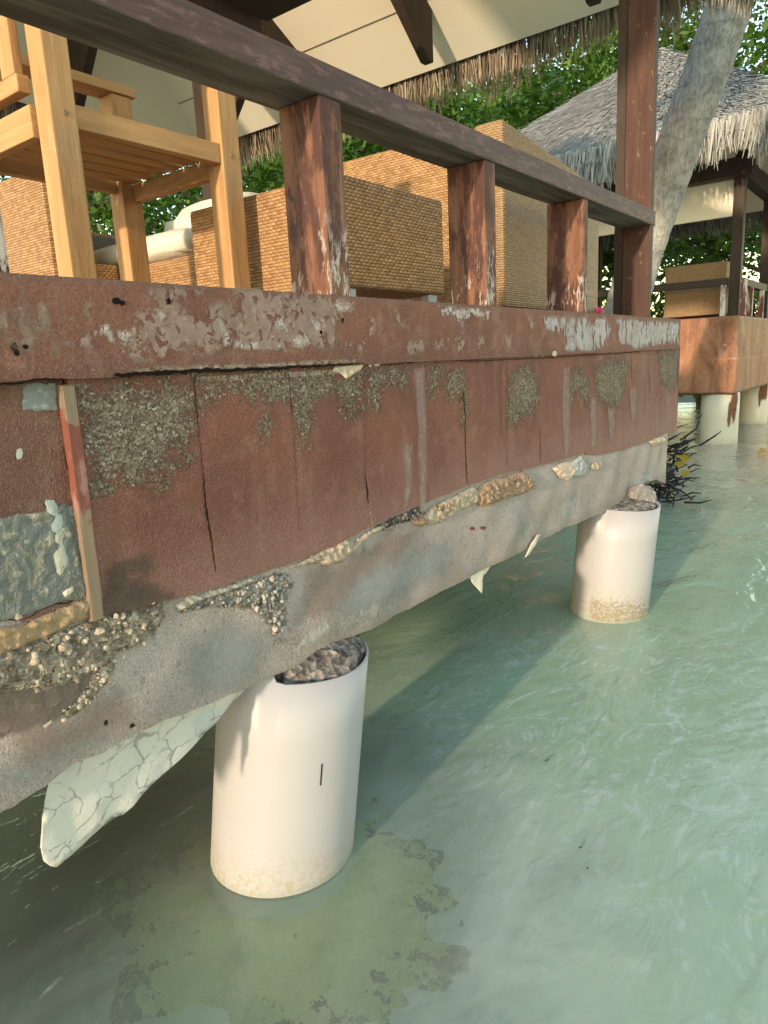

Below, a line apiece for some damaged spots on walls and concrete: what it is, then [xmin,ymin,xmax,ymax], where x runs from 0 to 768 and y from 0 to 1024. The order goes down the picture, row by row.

peeling [0,287,375,360]
crack [115,350,679,572]
spalling [374,471,535,531]
spalling [552,456,602,481]
spalling [0,500,293,737]